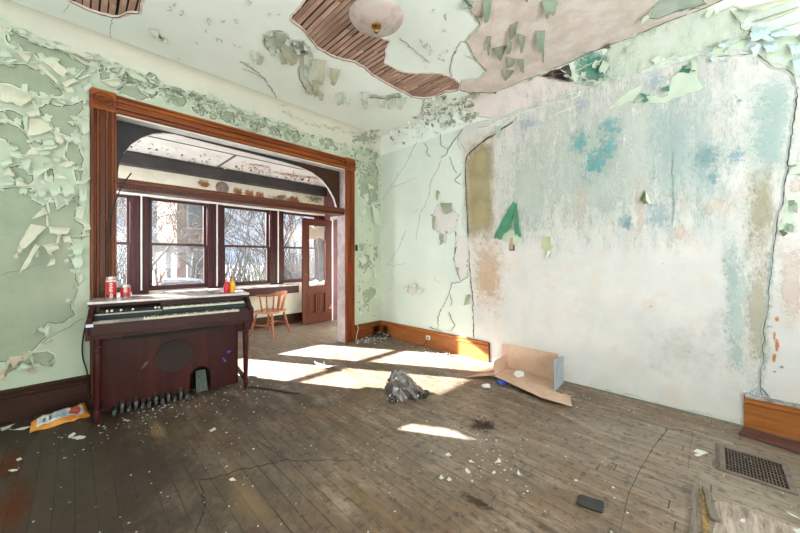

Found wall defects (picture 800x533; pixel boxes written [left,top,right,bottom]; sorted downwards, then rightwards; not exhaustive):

damp [574,51,609,82]
peeling [0,17,382,381]
damp [466,146,493,232]
crack [383,90,581,338]
peeling [251,0,800,424]
damp [570,114,622,180]
damp [695,142,719,183]
crack [699,54,798,398]
damp [751,177,773,243]